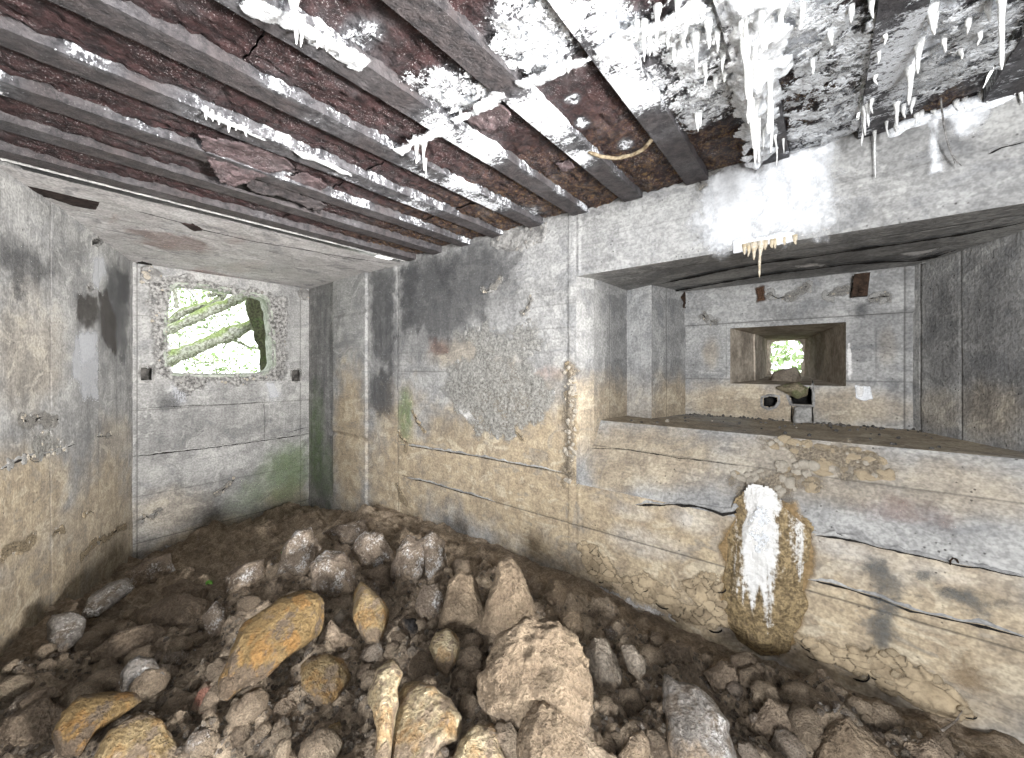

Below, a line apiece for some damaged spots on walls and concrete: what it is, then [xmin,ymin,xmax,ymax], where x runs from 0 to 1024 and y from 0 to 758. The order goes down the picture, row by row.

water stain [392,64,505,179]
corrosion [457,98,511,131]
water stain [693,0,1024,251]
water stain [73,257,116,399]
spalling [18,412,61,462]
crack [636,499,738,516]
water stain [718,484,816,656]
crack [808,578,1024,637]